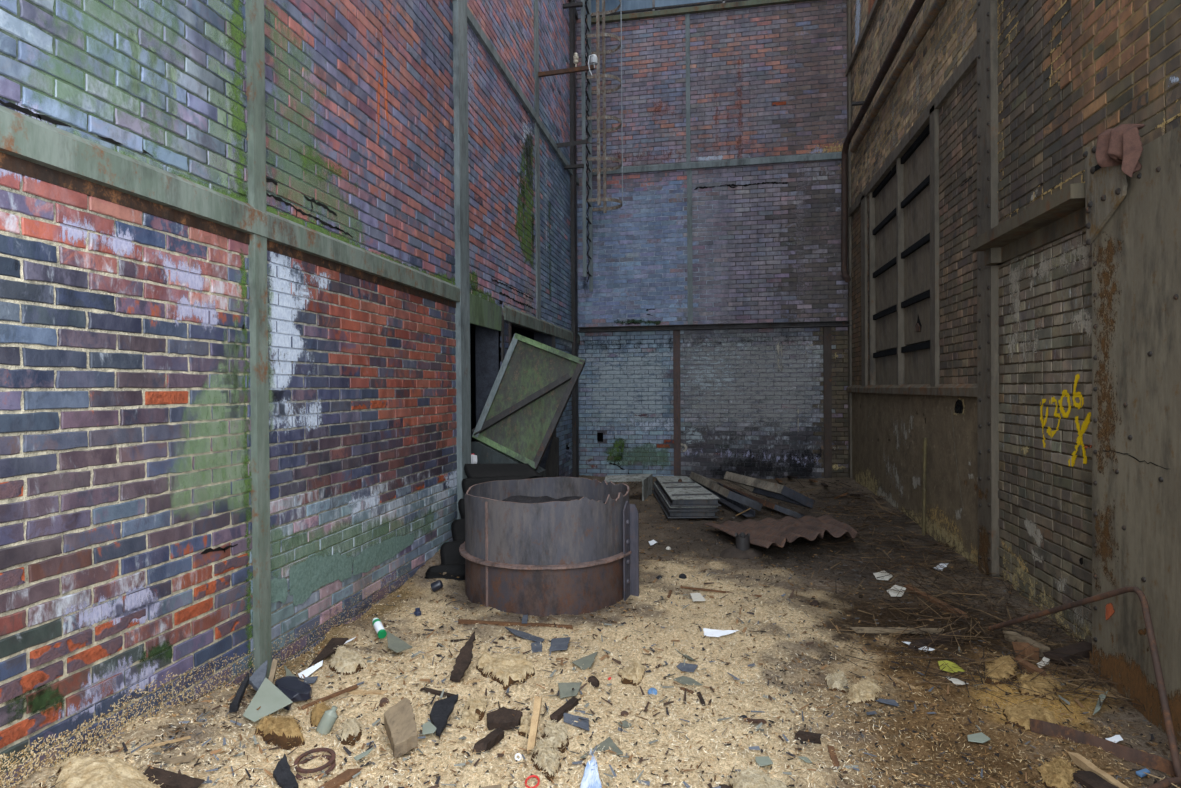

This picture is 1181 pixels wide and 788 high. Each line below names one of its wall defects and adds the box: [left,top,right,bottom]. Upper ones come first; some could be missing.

leakage [520,121,551,301]
leakage [267,252,331,433]
corrosion [1093,232,1122,475]
corrosion [1089,635,1181,746]